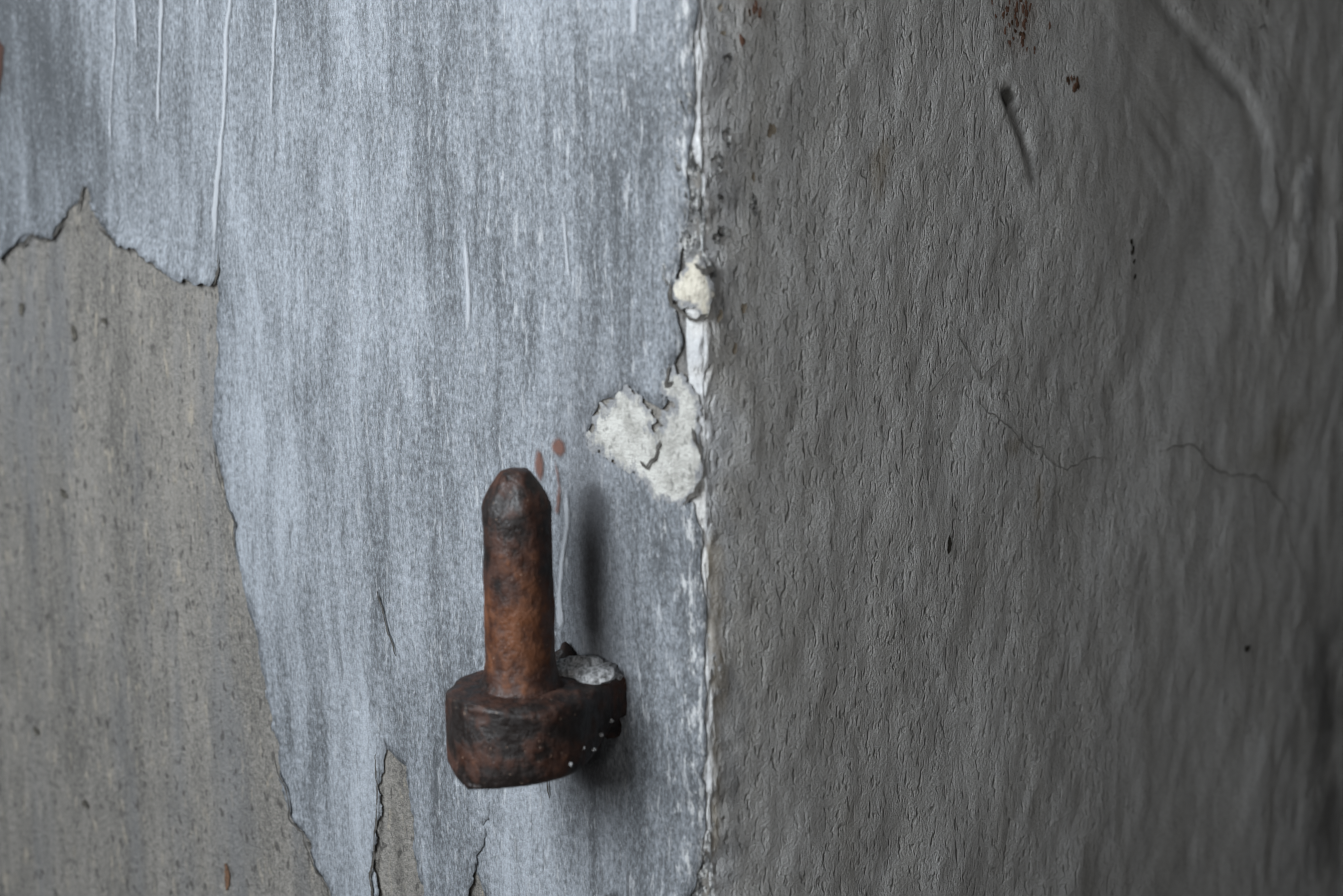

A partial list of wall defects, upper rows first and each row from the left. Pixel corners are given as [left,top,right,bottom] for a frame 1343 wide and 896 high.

corrosion [991,0,1036,54]
spalling [662,92,732,323]
peeling [0,186,490,896]
corrosion [535,439,564,512]
peeling [586,364,705,506]
crack [929,329,1107,471]
crack [1161,303,1309,626]
spalling [683,822,714,896]